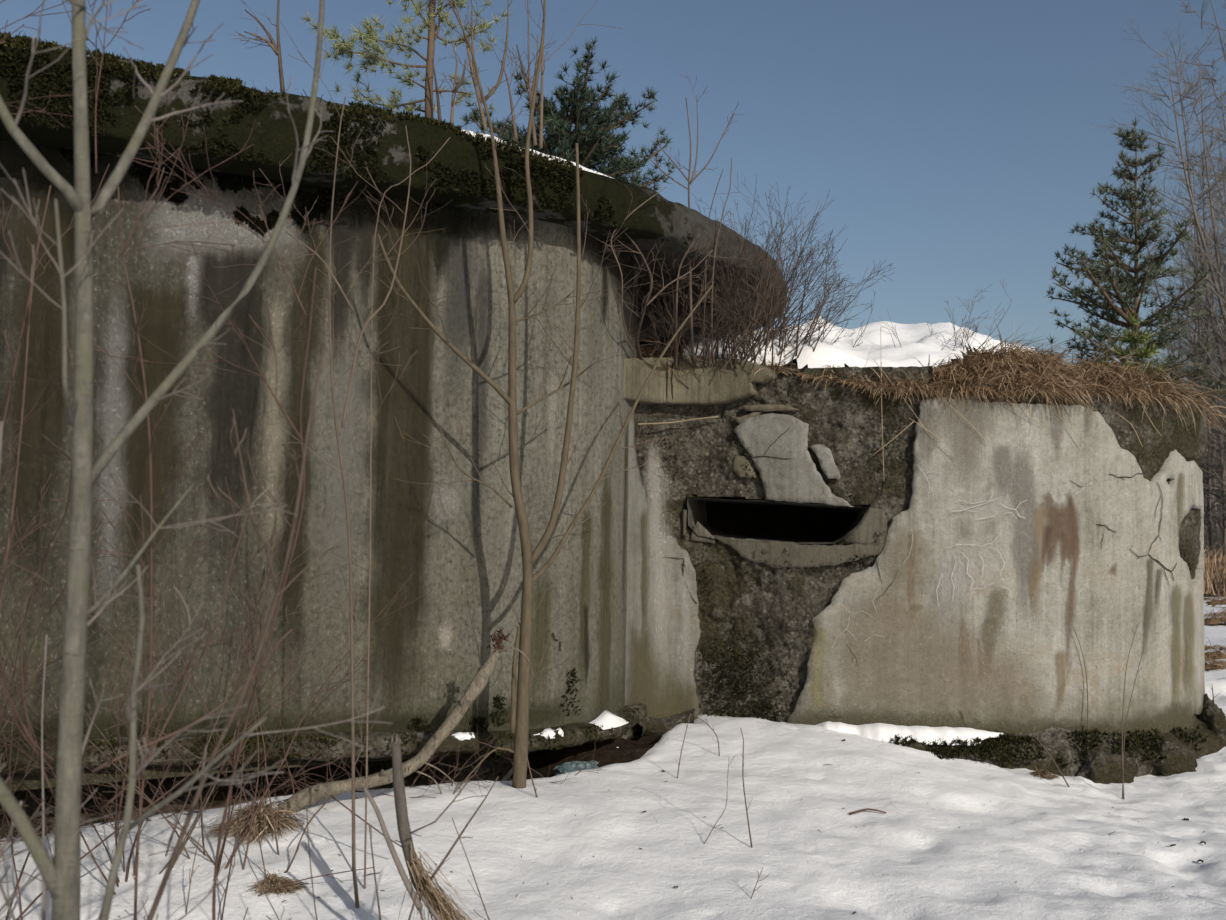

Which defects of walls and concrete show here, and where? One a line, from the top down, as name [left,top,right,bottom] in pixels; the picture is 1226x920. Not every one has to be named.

water stain [90,153,172,187]
water stain [574,229,637,338]
water stain [100,181,528,693]
water stain [581,433,628,699]
water stain [632,452,692,729]
spalling [623,356,933,722]
crack [867,558,898,617]
water stain [796,559,1195,738]
corrosion [1030,497,1079,703]
crack [1070,473,1177,587]
spalling [1178,508,1201,579]
spalling [901,693,1226,784]